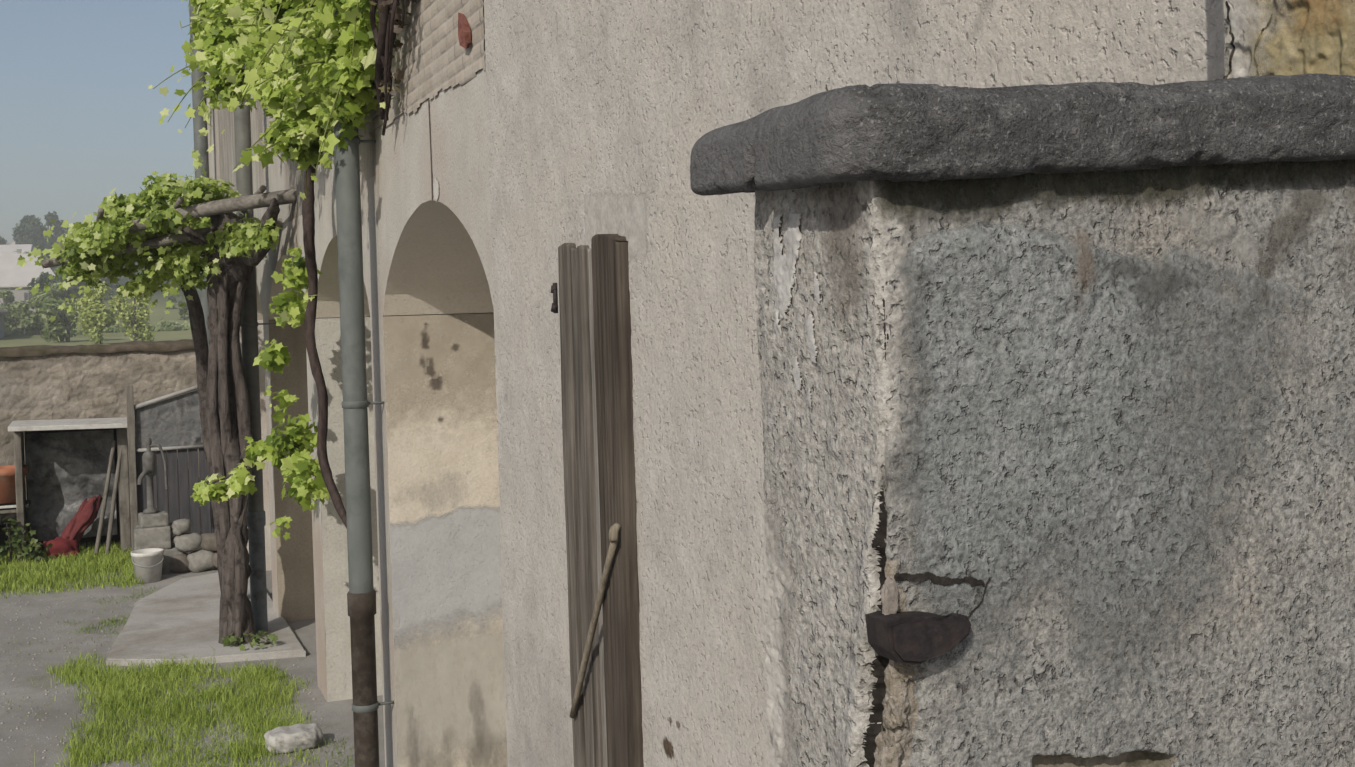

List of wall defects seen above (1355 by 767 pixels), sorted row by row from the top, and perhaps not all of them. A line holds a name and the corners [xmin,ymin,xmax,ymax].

crack [1223,1,1272,79]
leakage [383,313,496,412]
crack [881,286,889,360]
crack [871,476,991,619]
leakage [394,633,507,760]
crack [862,655,889,767]